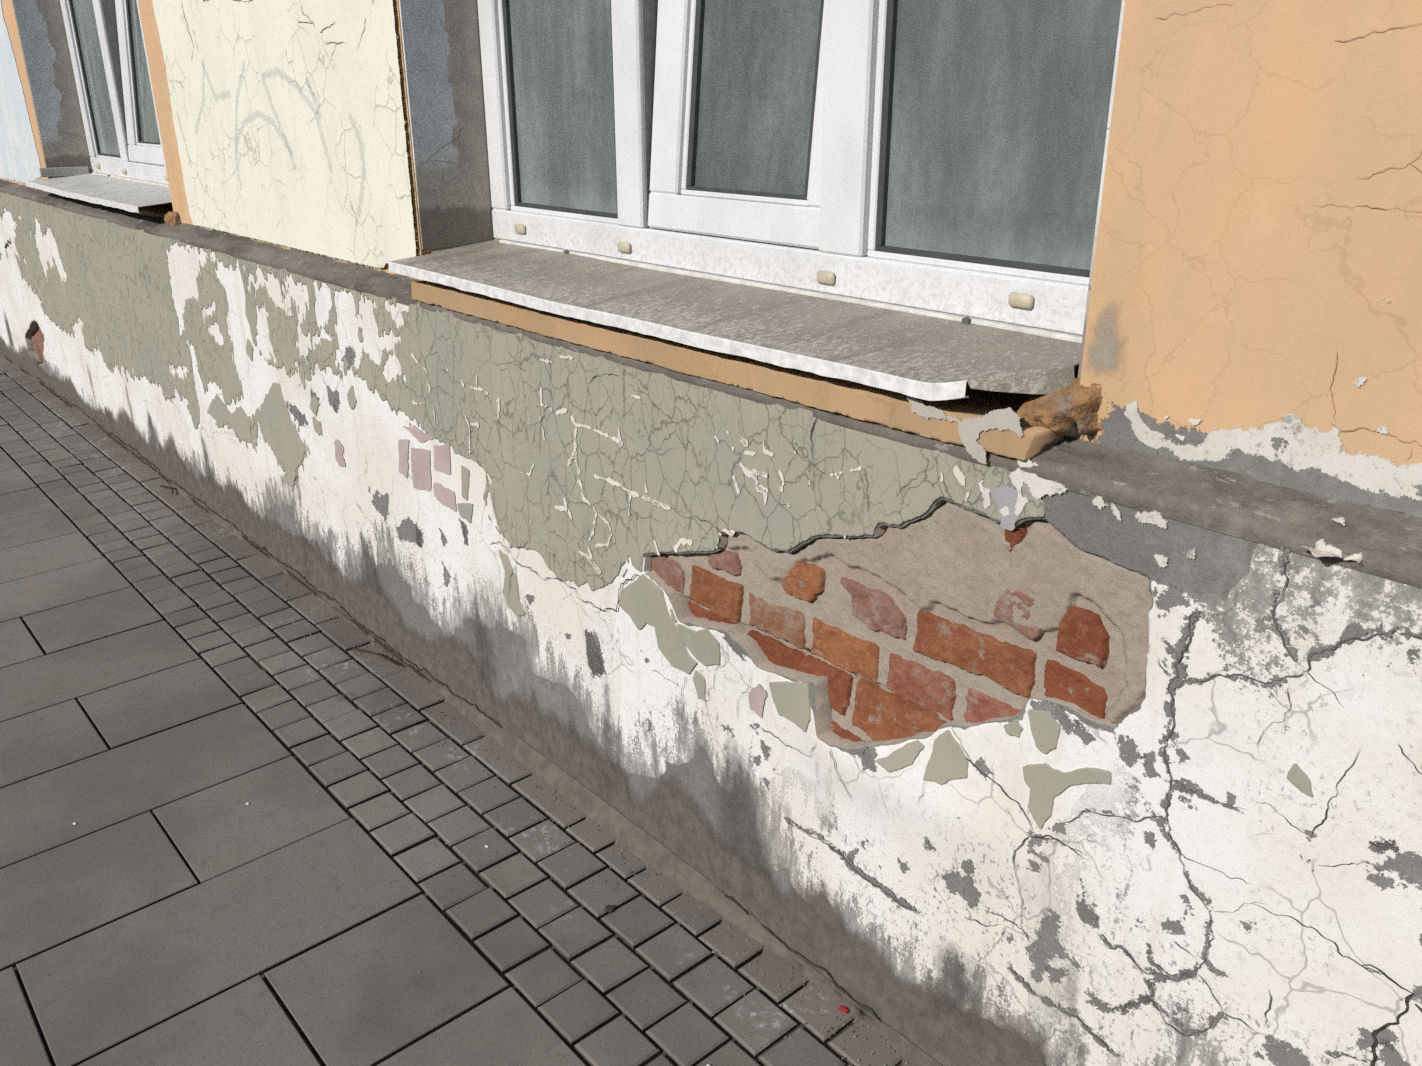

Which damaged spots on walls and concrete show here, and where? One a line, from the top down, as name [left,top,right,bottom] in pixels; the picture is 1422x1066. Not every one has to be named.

peeling [29,216,67,285]
water stain [1090,313,1119,369]
crack [36,376,502,728]
crack [766,418,932,513]
peeling [906,395,1023,464]
peeling [978,458,1068,531]
peeling [1092,495,1168,529]
peeling [1092,399,1422,519]
water stain [0,317,1045,1066]
crack [951,546,1422,1066]
crack [784,816,918,915]
crack [724,895,888,1027]